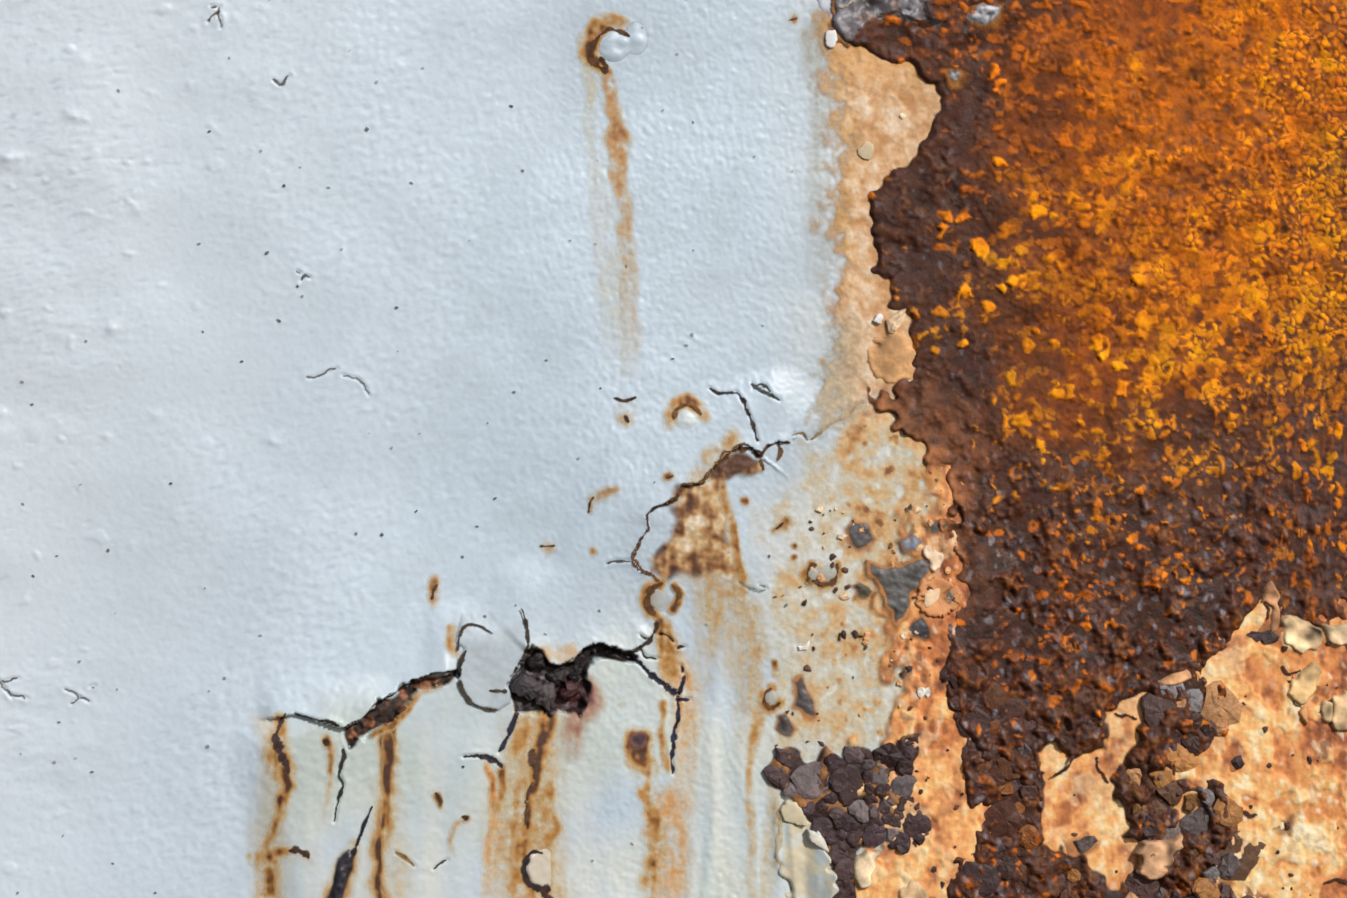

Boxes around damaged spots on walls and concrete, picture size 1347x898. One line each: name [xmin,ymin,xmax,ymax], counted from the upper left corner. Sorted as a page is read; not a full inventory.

crack [709,383,780,441]
rust [743,0,1347,898]
peeling [846,519,948,640]
crack [296,713,347,822]
rust [323,727,399,898]
crack [463,708,519,769]
rust [484,710,565,898]
crack [629,620,690,774]
rust [624,615,696,898]
peeling [776,674,817,736]
peeling [775,800,839,898]
peeling [1247,581,1347,731]